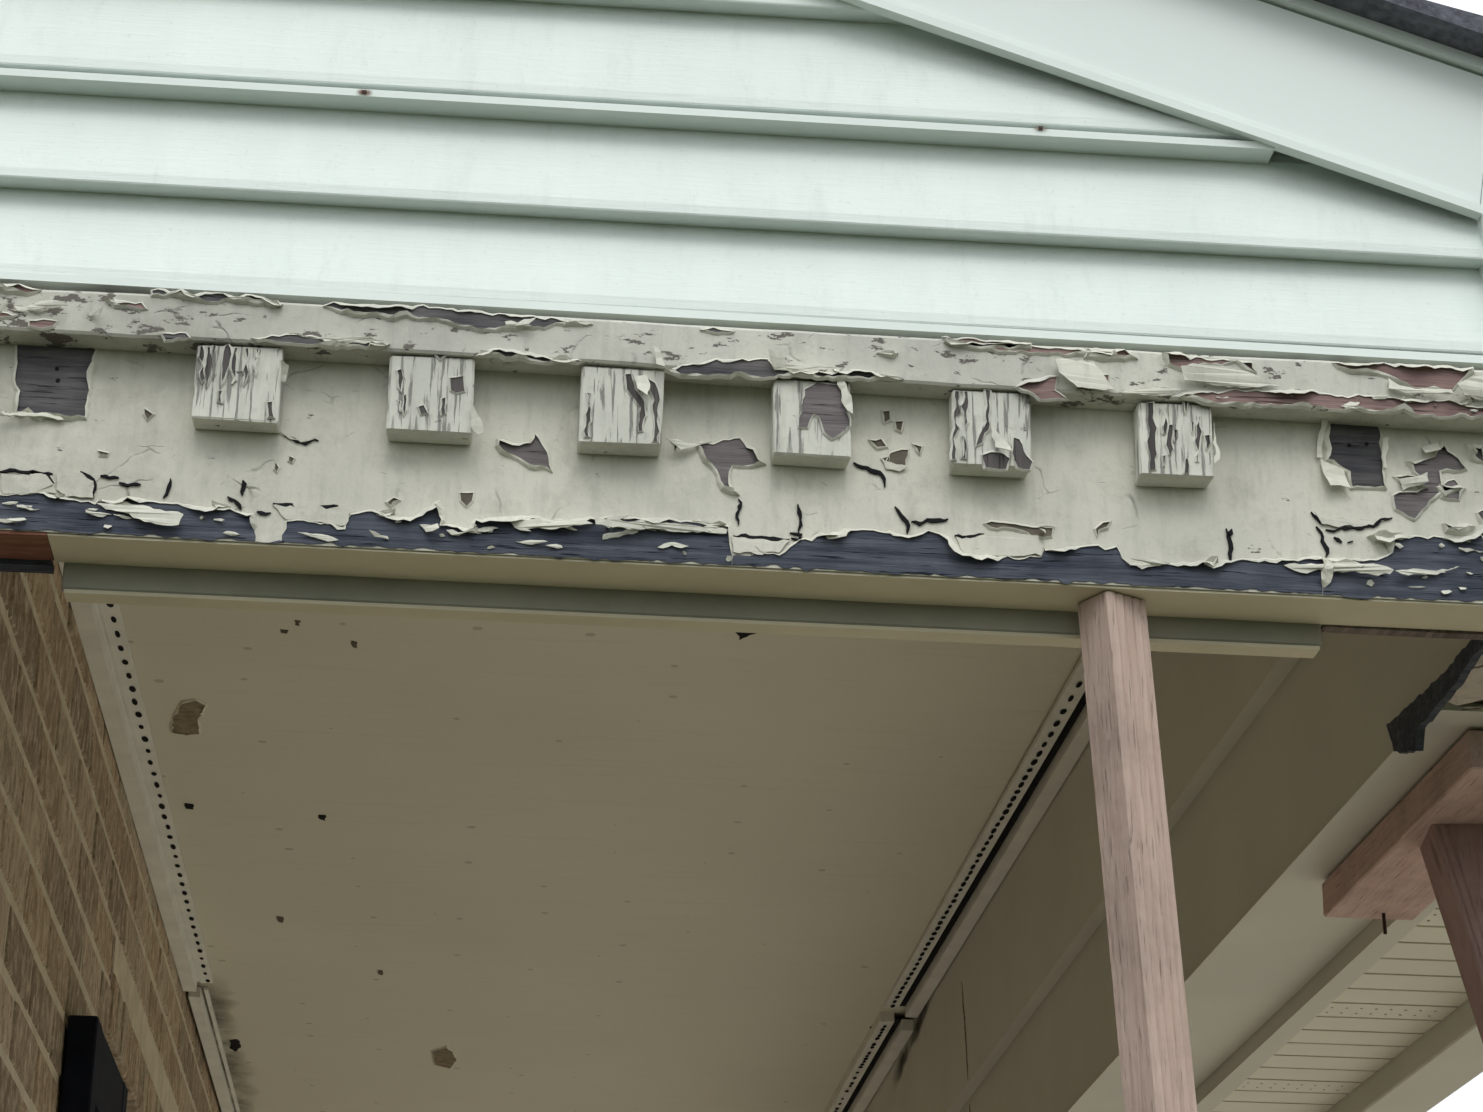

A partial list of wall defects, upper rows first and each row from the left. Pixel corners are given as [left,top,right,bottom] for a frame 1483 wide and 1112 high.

peeling [87,288,283,316]
peeling [160,332,390,404]
peeling [322,301,593,366]
peeling [395,354,553,473]
peeling [624,346,904,496]
peeling [867,410,924,471]
peeling [939,336,1483,488]
peeling [86,498,240,536]
peeling [419,492,728,555]
peeling [983,520,1055,539]
peeling [1284,509,1483,594]
peeling [1382,437,1483,549]